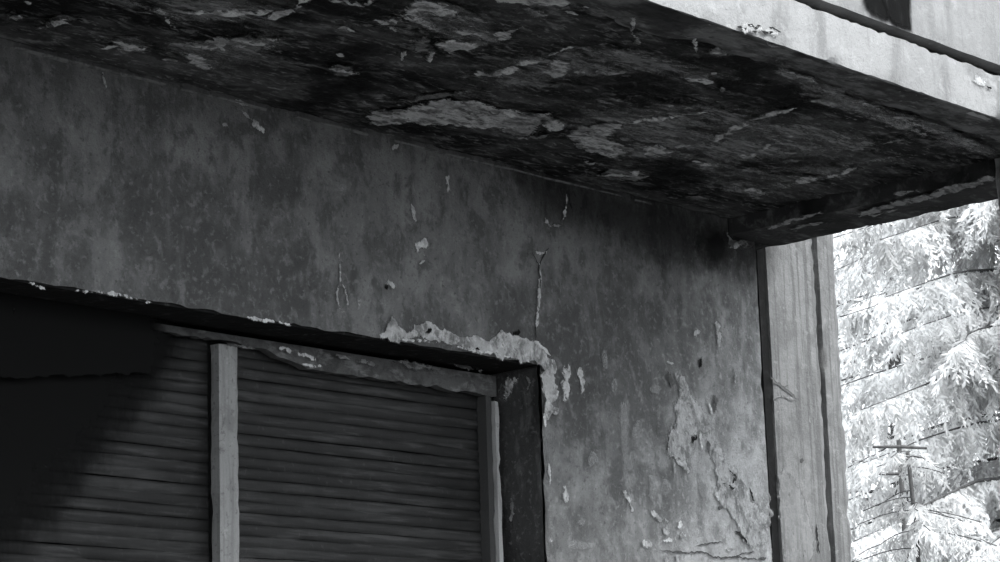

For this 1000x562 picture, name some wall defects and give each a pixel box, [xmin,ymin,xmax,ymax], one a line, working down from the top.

peeling [123,0,310,28]
peeling [162,36,283,70]
peeling [373,0,518,62]
peeling [474,18,738,92]
spalling [737,23,780,47]
damp [864,0,912,31]
peeling [366,64,996,199]
spalling [853,175,995,217]
crack [532,186,572,339]
flaking render [380,316,585,427]
flaking render [666,361,820,562]
crack [642,537,762,562]